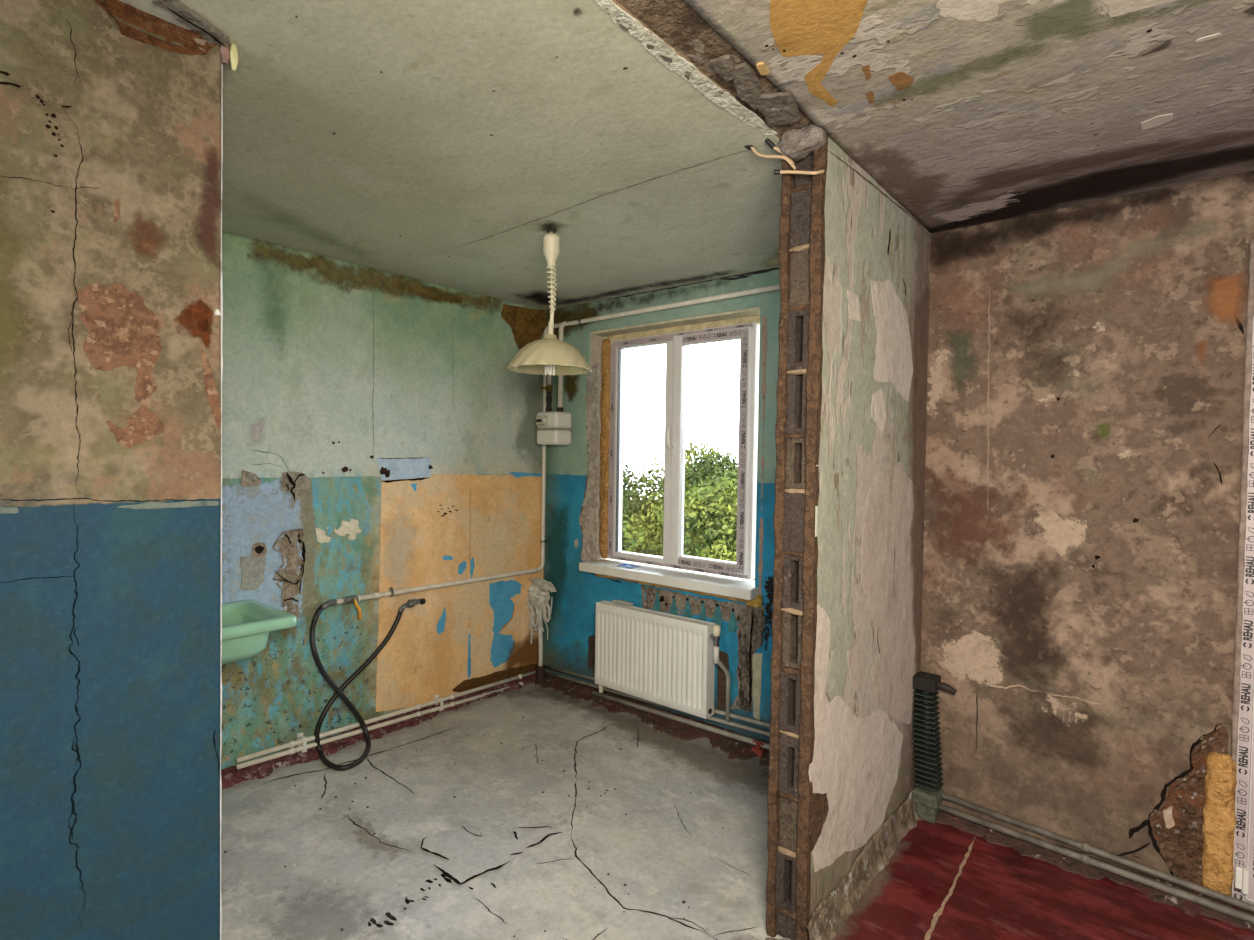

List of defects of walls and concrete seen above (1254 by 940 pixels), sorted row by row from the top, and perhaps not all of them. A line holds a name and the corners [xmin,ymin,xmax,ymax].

flaking render [95,0,217,56]
peeling [770,0,868,106]
leakage [862,132,1254,267]
flaking render [75,284,164,448]
rust [176,300,213,347]
crack [0,22,213,926]
flaking render [240,528,306,615]
peeling [809,462,917,872]
flaking render [935,630,1006,686]
crack [347,816,407,850]
crack [537,723,756,940]
flaking render [1148,724,1229,886]